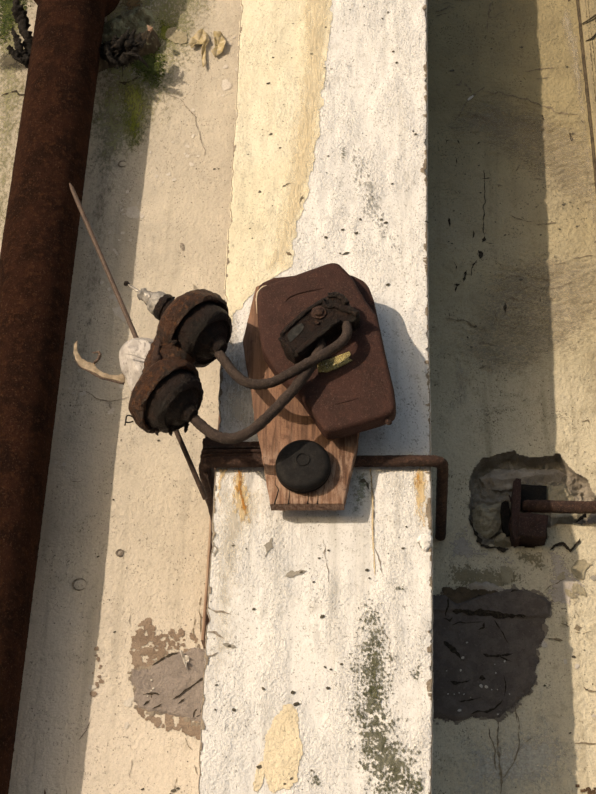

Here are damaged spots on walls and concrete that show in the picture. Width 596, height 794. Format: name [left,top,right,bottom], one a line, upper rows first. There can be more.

crack [161,91,206,155]
peeling [165,0,333,322]
spalling [412,0,428,202]
spalling [423,216,431,455]
crack [454,173,593,329]
corrosion [233,468,250,521]
peeling [123,468,217,794]
peeling [253,690,303,793]
damp [362,645,387,714]
damp [406,771,424,794]
crack [443,598,533,794]
flaking render [426,450,596,794]